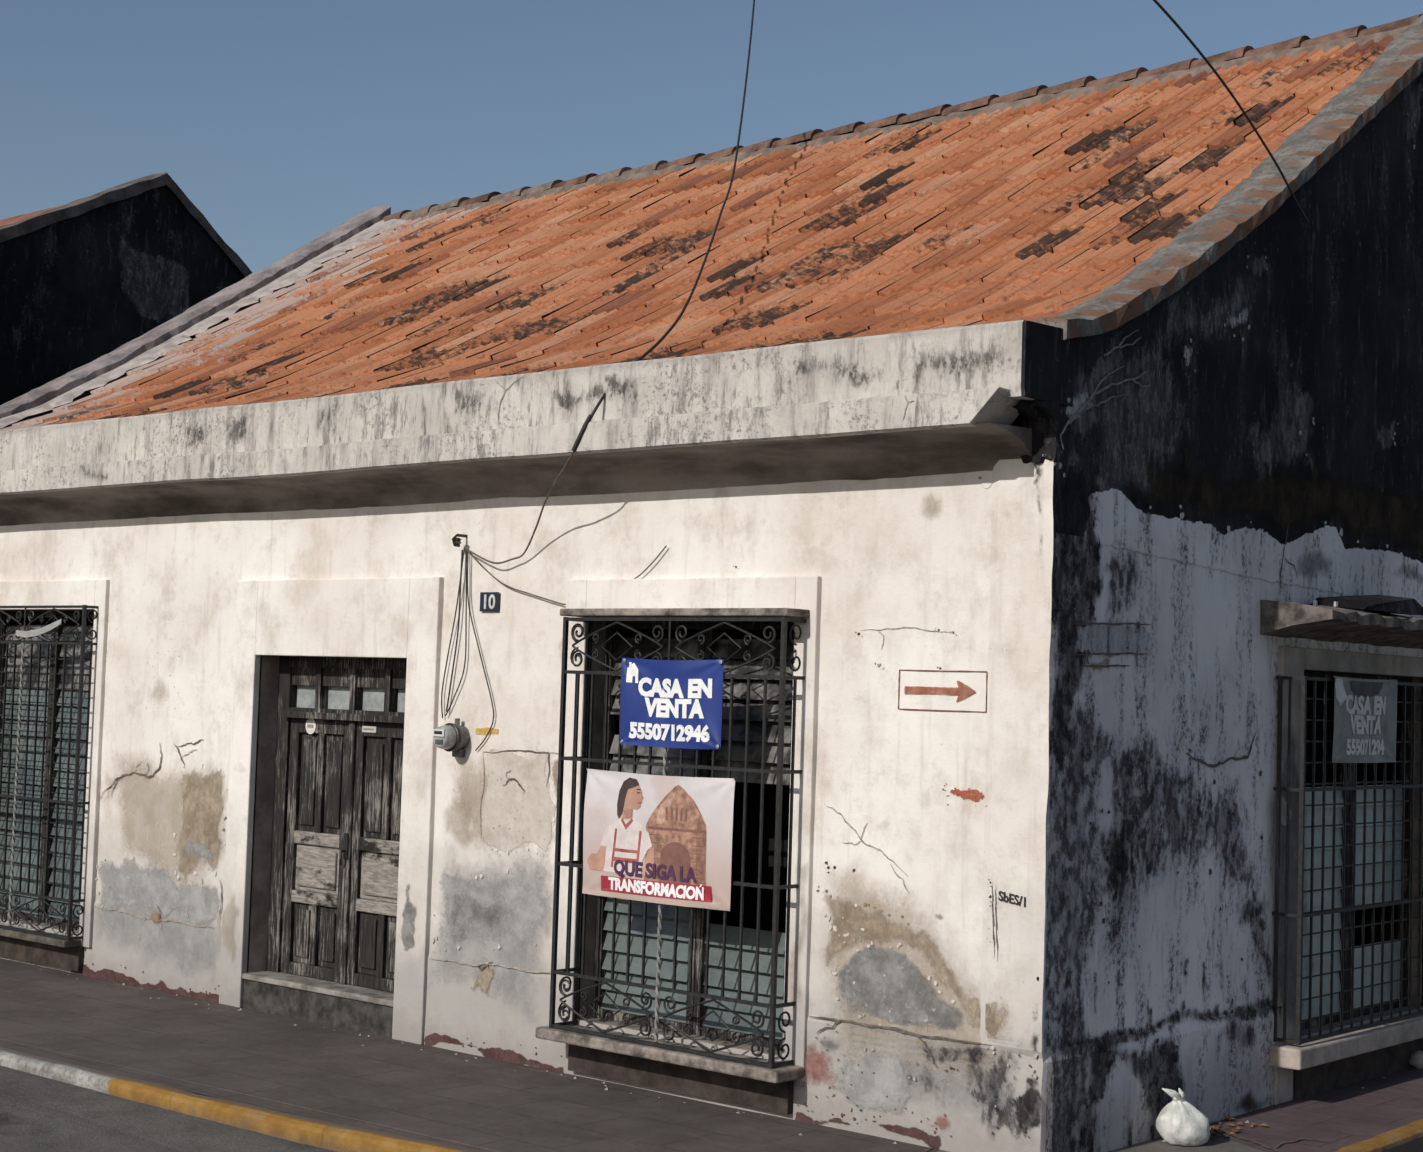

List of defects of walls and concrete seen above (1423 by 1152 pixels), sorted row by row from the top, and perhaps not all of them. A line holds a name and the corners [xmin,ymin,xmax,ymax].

damp [557,374,636,410]
damp [832,359,867,385]
damp [915,351,1009,382]
peeling [1013,255,1423,618]
crack [860,627,951,650]
peeling [1074,622,1151,670]
crack [100,739,203,798]
peeling [173,763,228,878]
peeling [481,749,556,873]
crack [825,805,910,894]
damp [789,423,1313,1152]
damp [445,868,549,998]